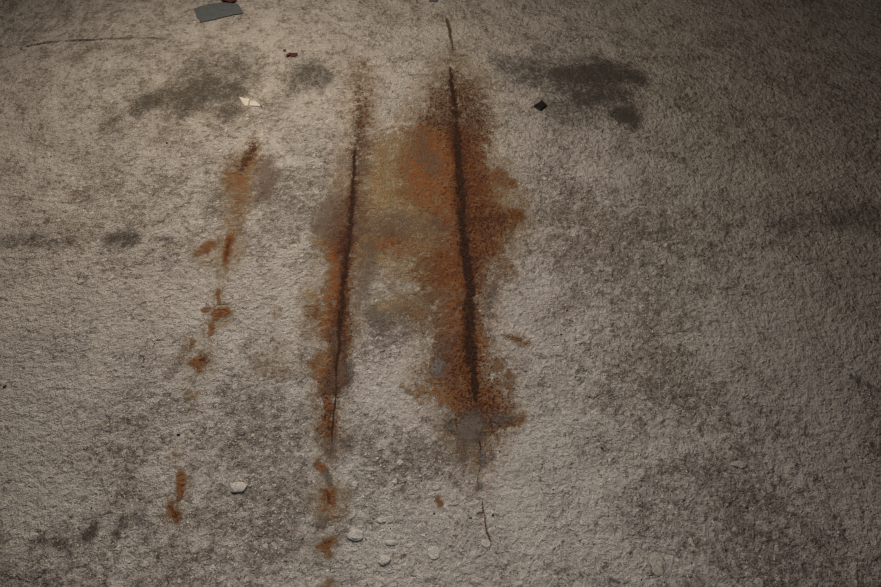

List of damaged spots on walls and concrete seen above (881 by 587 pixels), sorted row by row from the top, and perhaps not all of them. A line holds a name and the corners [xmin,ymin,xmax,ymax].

corrosion [193,137,278,276]
crack [445,18,479,401]
corrosion [169,287,232,372]
crack [329,149,356,456]
corrosion [302,43,531,521]
corrosion [165,468,189,524]
corrosion [314,535,337,558]